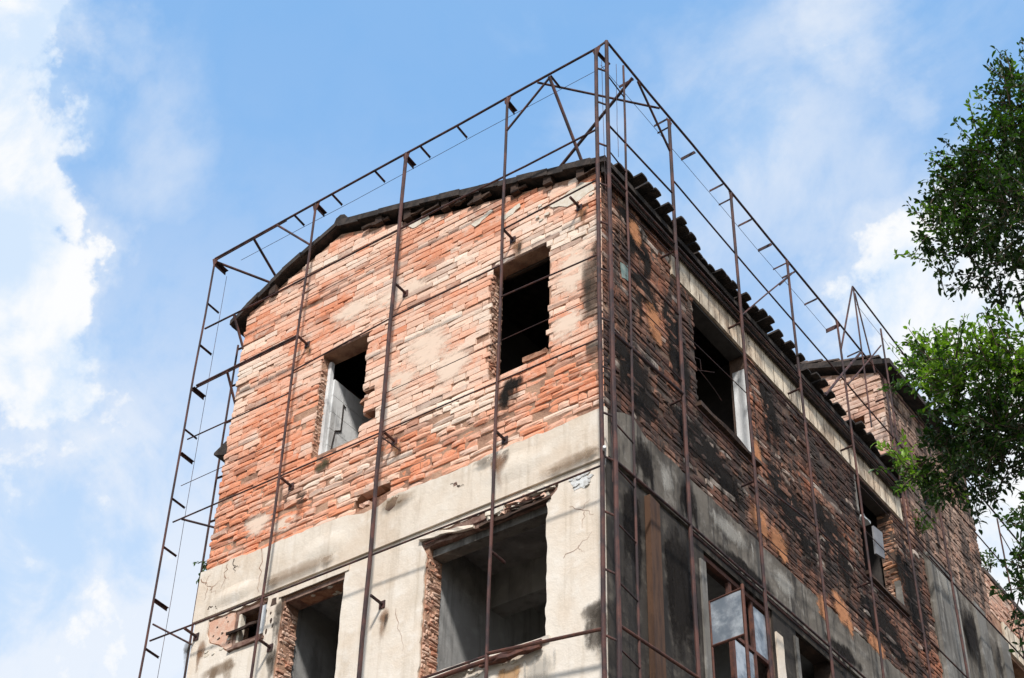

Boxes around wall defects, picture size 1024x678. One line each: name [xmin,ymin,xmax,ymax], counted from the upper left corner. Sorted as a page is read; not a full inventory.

leakage [499,376,523,407]
leakage [615,204,740,505]
flaking render [203,612,237,657]
crack [201,548,263,610]
spalling [418,471,594,678]
leakage [624,491,642,591]
leakage [665,528,700,646]
leakage [680,484,698,534]
leakage [759,382,909,667]
leakage [825,632,862,676]
leakage [896,548,928,643]
leakage [963,606,982,670]